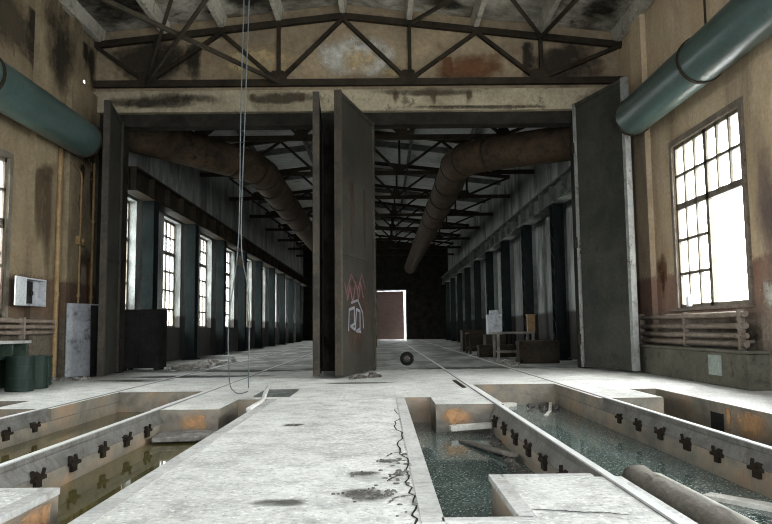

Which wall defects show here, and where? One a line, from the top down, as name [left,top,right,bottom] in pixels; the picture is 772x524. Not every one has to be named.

leakage [0,0,35,66]
peeling [318,37,402,76]
leakage [35,165,52,253]
corrosion [445,410,469,424]
crack [378,409,418,524]